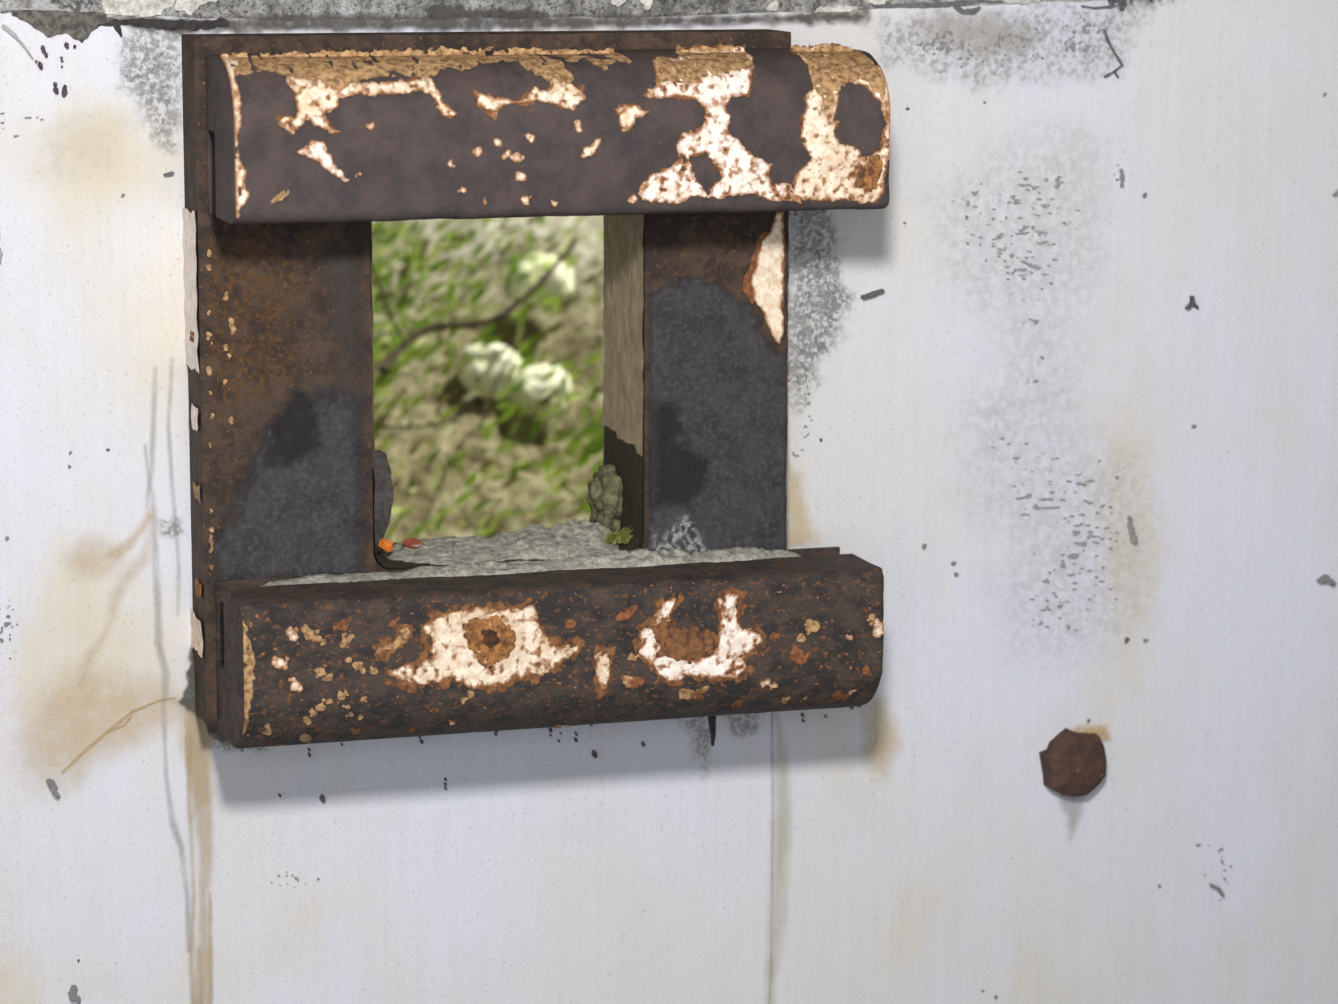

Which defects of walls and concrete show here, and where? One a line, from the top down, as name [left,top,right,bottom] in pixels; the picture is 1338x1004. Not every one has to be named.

water stain [788,210,851,480]
spalling [481,629,500,649]